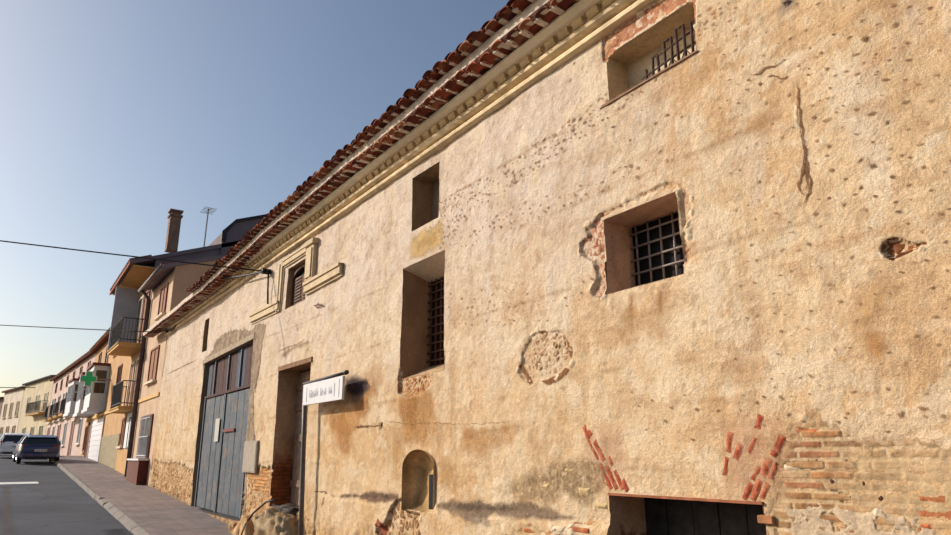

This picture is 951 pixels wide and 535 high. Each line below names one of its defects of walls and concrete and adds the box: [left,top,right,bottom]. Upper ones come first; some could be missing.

flaking render [810,53,877,122]
crack [753,59,812,204]
flaking render [879,230,927,264]
flaking render [448,289,575,385]
flaking render [398,368,432,397]
flaking render [722,396,765,476]
damp [341,492,398,502]
flaking render [375,499,422,535]
damp [438,501,558,523]
flaking render [513,425,629,535]
flaking render [742,412,951,535]